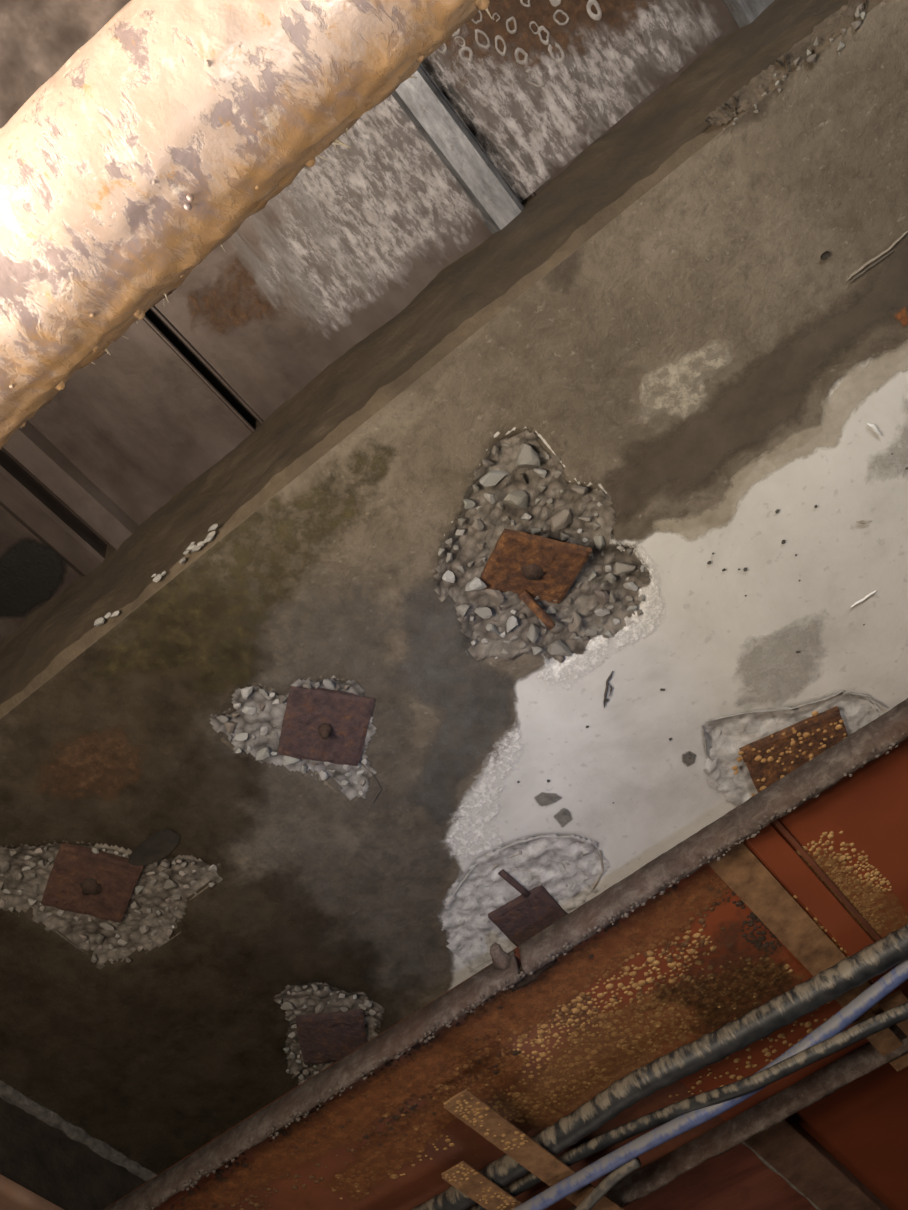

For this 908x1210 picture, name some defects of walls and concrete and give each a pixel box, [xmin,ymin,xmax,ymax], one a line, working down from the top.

water stain [0,540,66,617]
water stain [175,0,908,1027]
spalling [434,429,652,661]
spalling [210,678,377,800]
spalling [689,690,889,807]
corrosion [732,711,846,796]
spalling [0,842,222,969]
water stain [0,574,407,1175]
spalling [441,833,610,973]
corrosion [796,831,908,940]
spalling [273,982,385,1085]
corrosion [669,1001,833,1103]